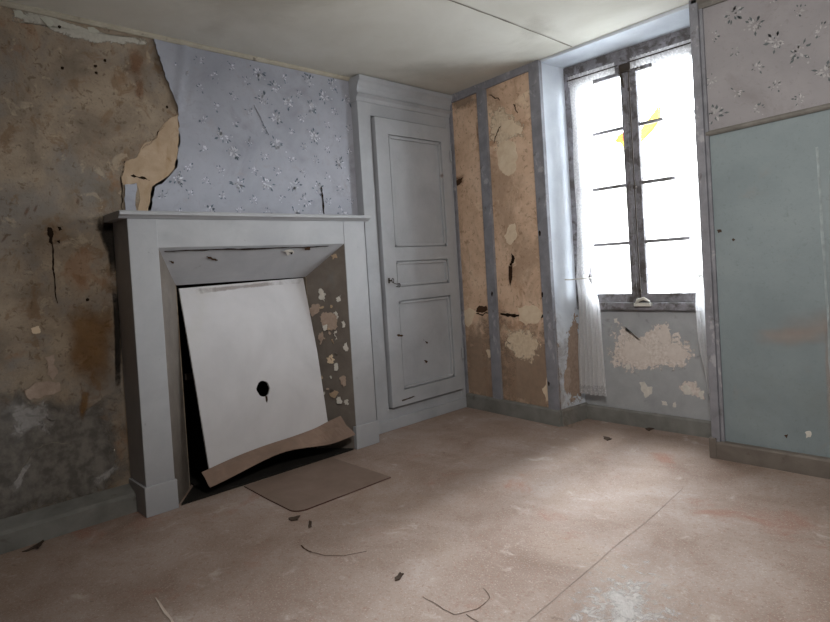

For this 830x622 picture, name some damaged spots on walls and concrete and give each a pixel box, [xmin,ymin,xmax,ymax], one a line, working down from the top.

peeling [489,107,524,176]
damp [74,293,121,380]
peeling [309,288,349,405]
peeling [607,318,698,373]
peeling [679,381,705,400]
damp [0,392,125,520]